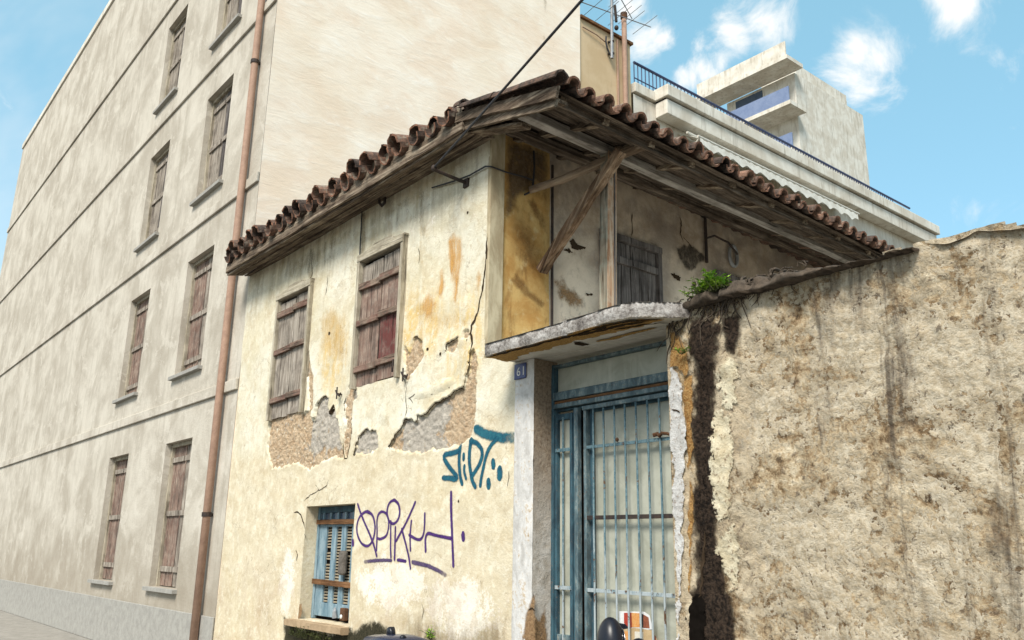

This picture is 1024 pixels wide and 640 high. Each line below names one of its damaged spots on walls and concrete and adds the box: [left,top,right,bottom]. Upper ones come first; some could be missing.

crack [466,240,661,358]
spalling [671,245,704,286]
spalling [269,319,662,470]
peeling [668,367,687,640]
leakage [688,314,740,640]